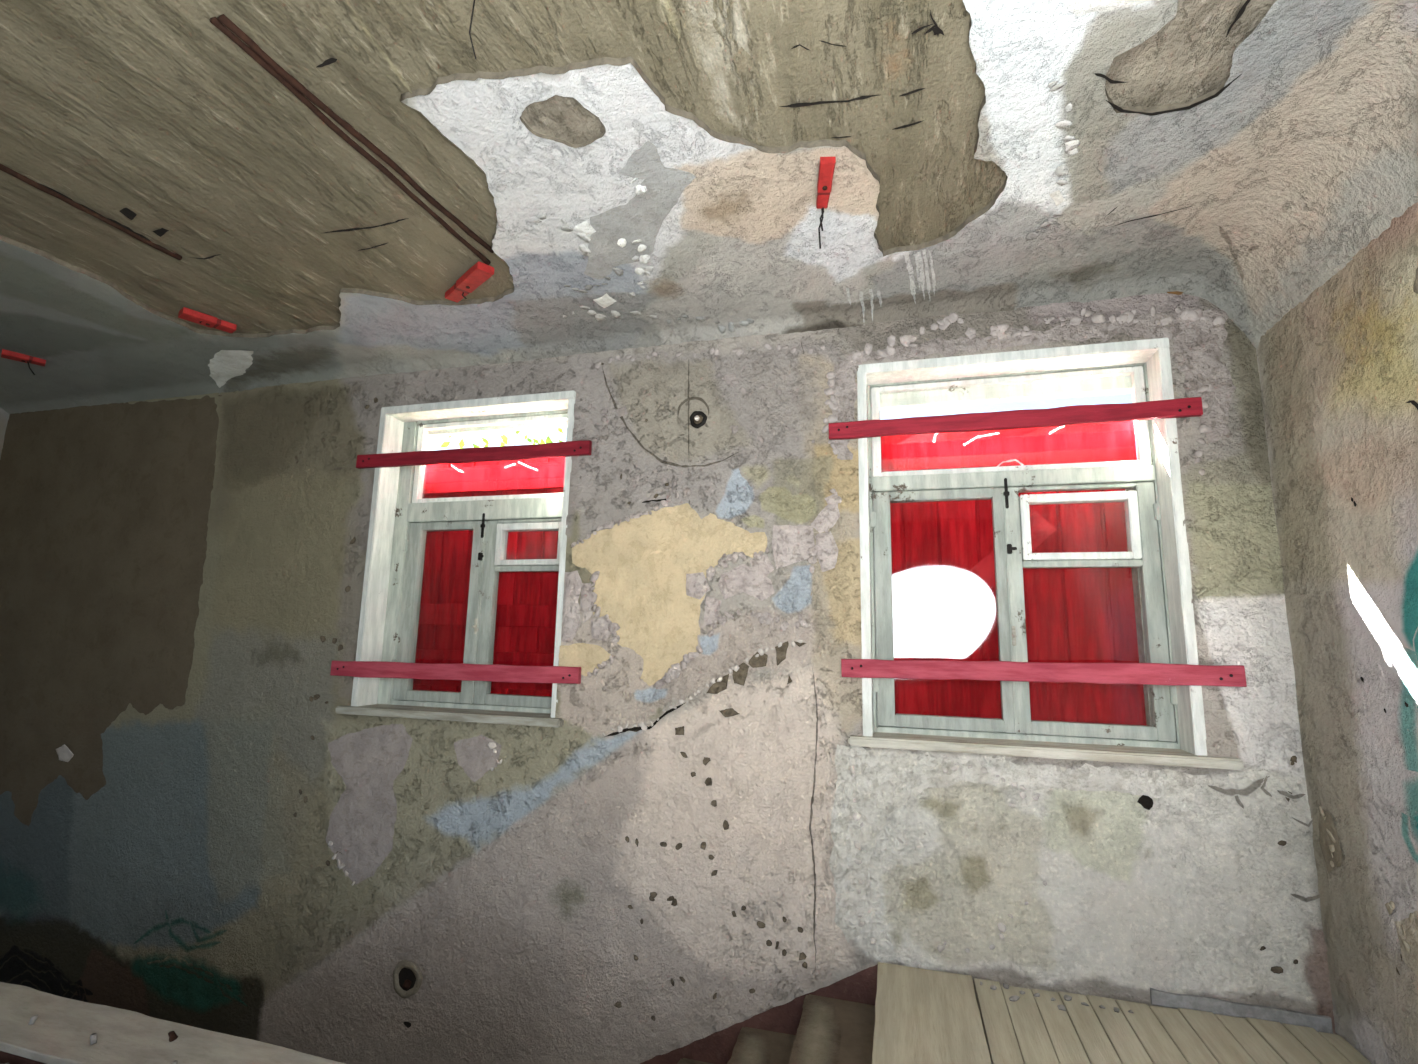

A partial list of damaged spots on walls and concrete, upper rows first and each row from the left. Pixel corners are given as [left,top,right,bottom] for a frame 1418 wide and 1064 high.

peeling [1060,0,1160,16]
spalling [1105,0,1277,113]
spalling [0,0,1008,830]
peeling [310,724,413,886]
crack [809,668,819,968]